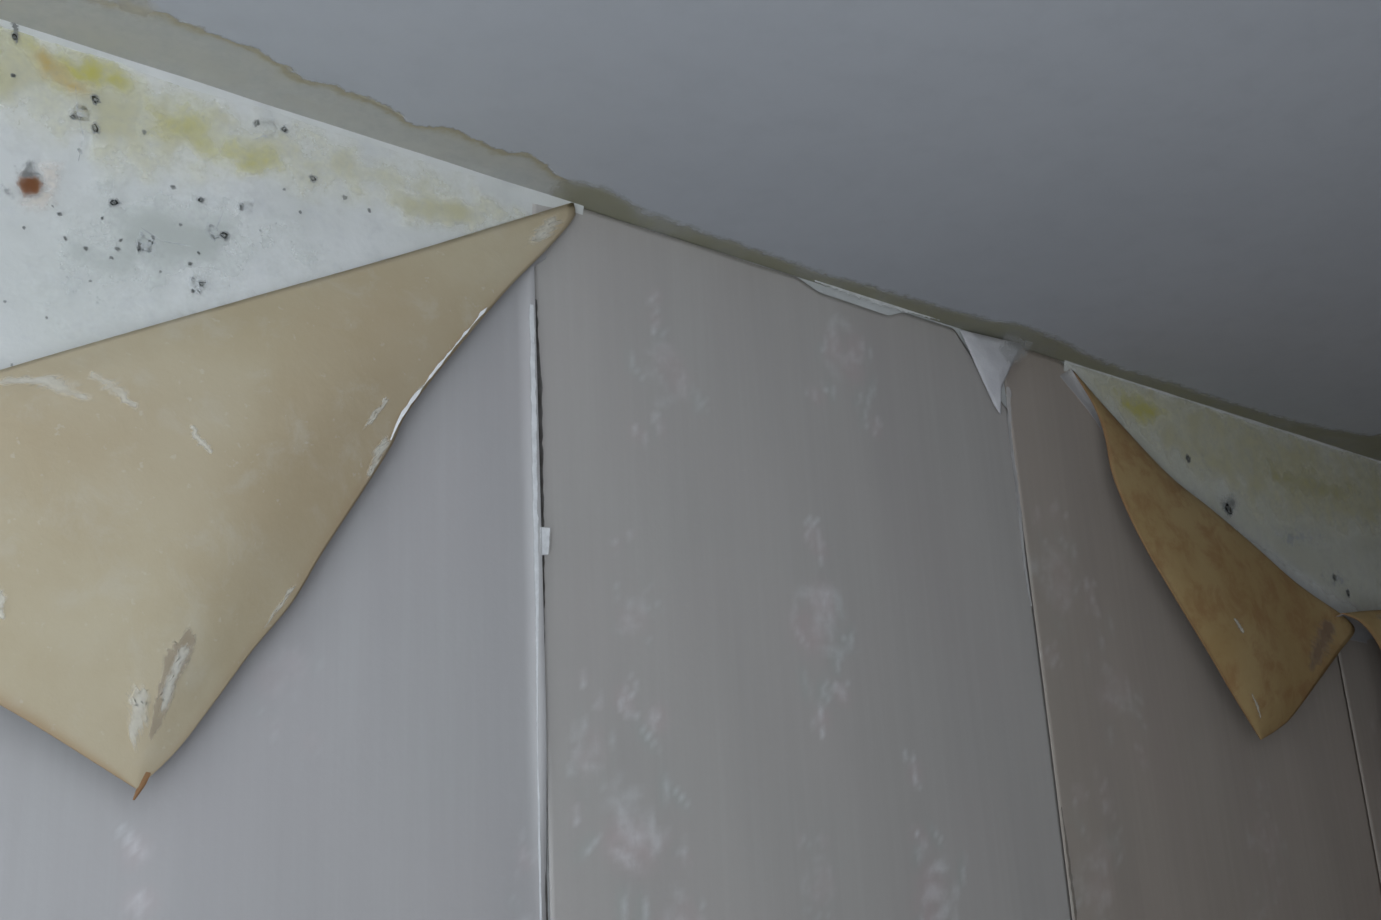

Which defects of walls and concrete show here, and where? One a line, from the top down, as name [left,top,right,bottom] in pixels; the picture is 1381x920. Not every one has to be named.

rust [5,162,52,201]
peeling [0,19,584,370]
leakage [0,0,1381,461]
peeling [540,527,550,555]
peeling [1064,360,1381,613]